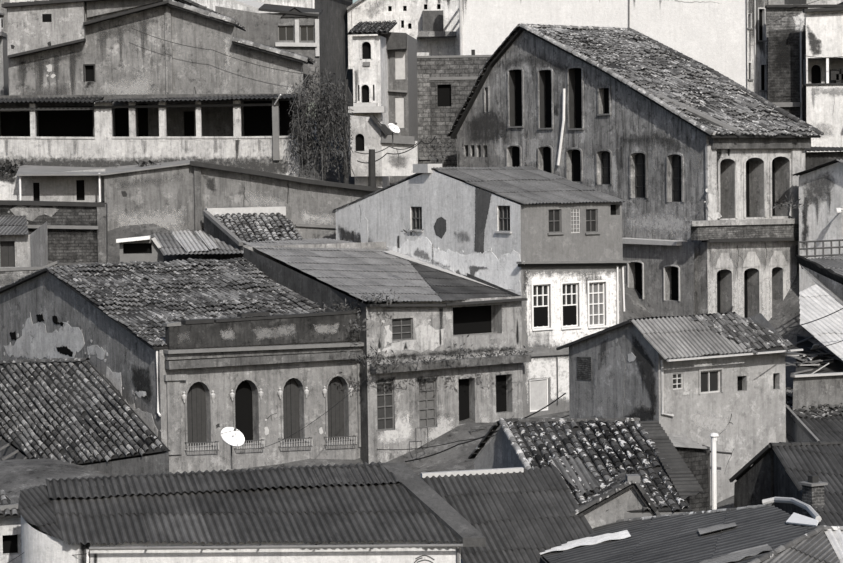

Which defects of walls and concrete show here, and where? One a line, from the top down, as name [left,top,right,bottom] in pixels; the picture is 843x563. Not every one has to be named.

peeling [387,236,525,294]
peeling [4,314,161,437]